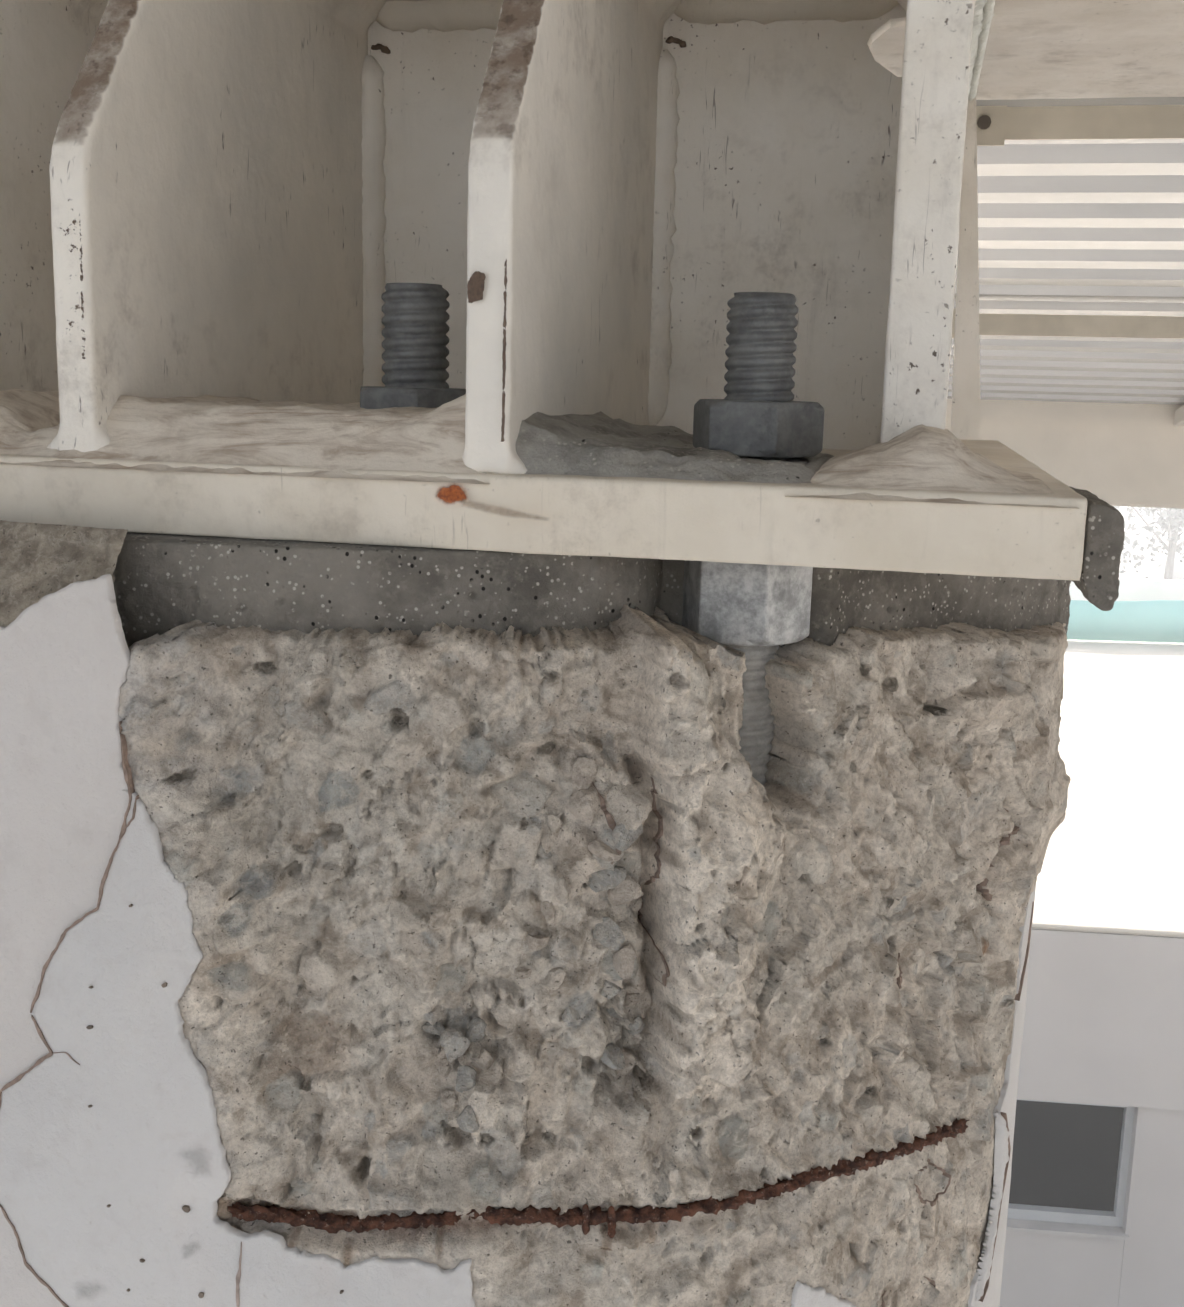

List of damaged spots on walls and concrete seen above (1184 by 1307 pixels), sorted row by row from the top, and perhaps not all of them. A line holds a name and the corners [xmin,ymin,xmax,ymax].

corrosion [436,484,467,504]
spalling [0,520,128,627]
crack [0,721,139,1108]
spalling [118,605,1071,1307]
crack [0,1204,69,1307]
crack [235,1242,243,1307]